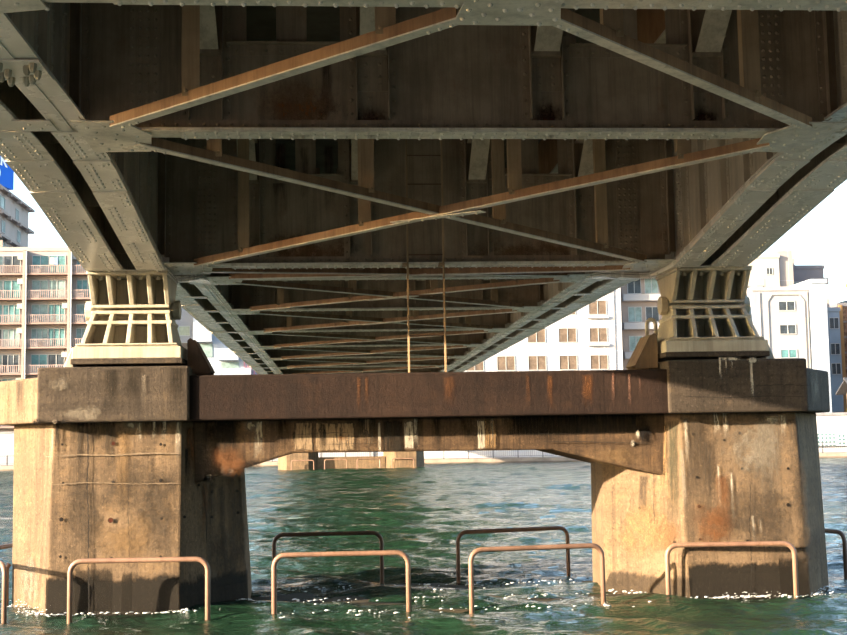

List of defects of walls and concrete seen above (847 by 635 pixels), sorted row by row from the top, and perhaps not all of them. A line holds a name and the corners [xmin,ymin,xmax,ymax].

leakage [46,409,180,459]
leakage [207,421,236,449]
leakage [358,418,422,451]
leakage [462,419,496,448]
leakage [508,414,643,436]
leakage [668,420,720,503]
leakage [688,416,811,600]
leakage [45,570,248,617]